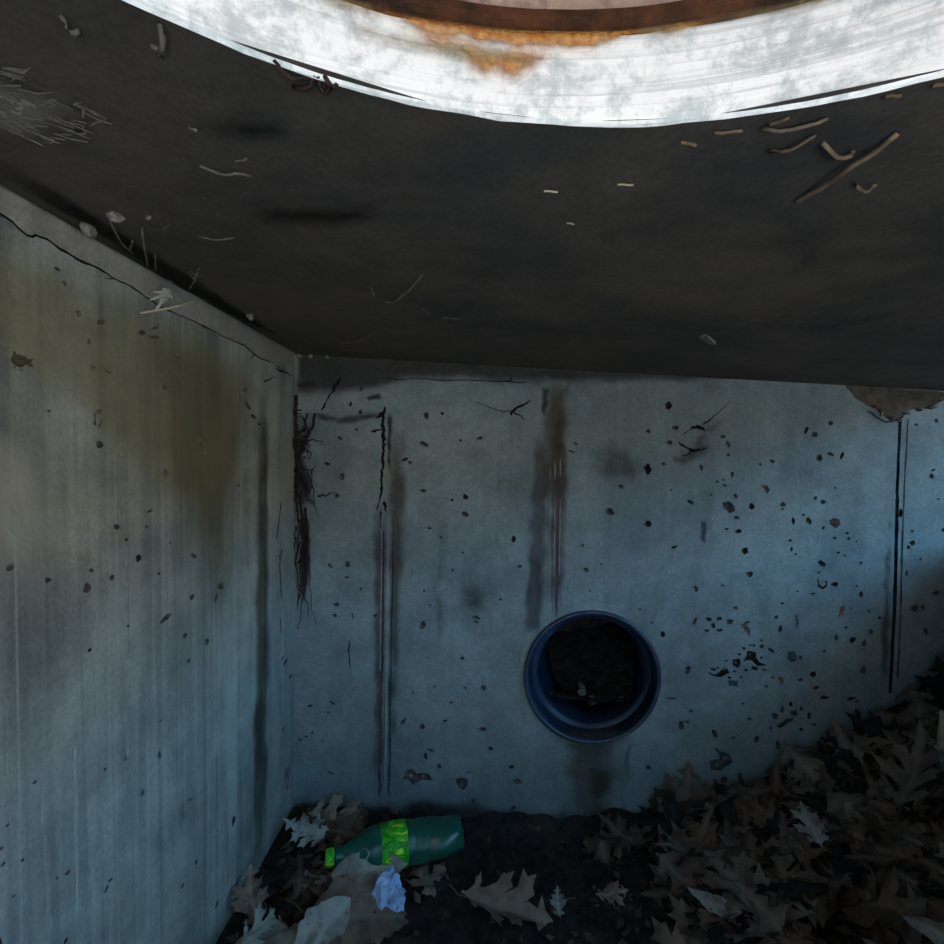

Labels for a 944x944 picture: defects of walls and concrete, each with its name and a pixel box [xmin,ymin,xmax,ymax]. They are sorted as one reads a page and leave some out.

rust [403,17,697,75]
crack [0,213,292,382]
crack [395,378,531,420]
peeling [845,385,944,426]
leakage [374,418,404,763]
leakage [527,389,565,627]